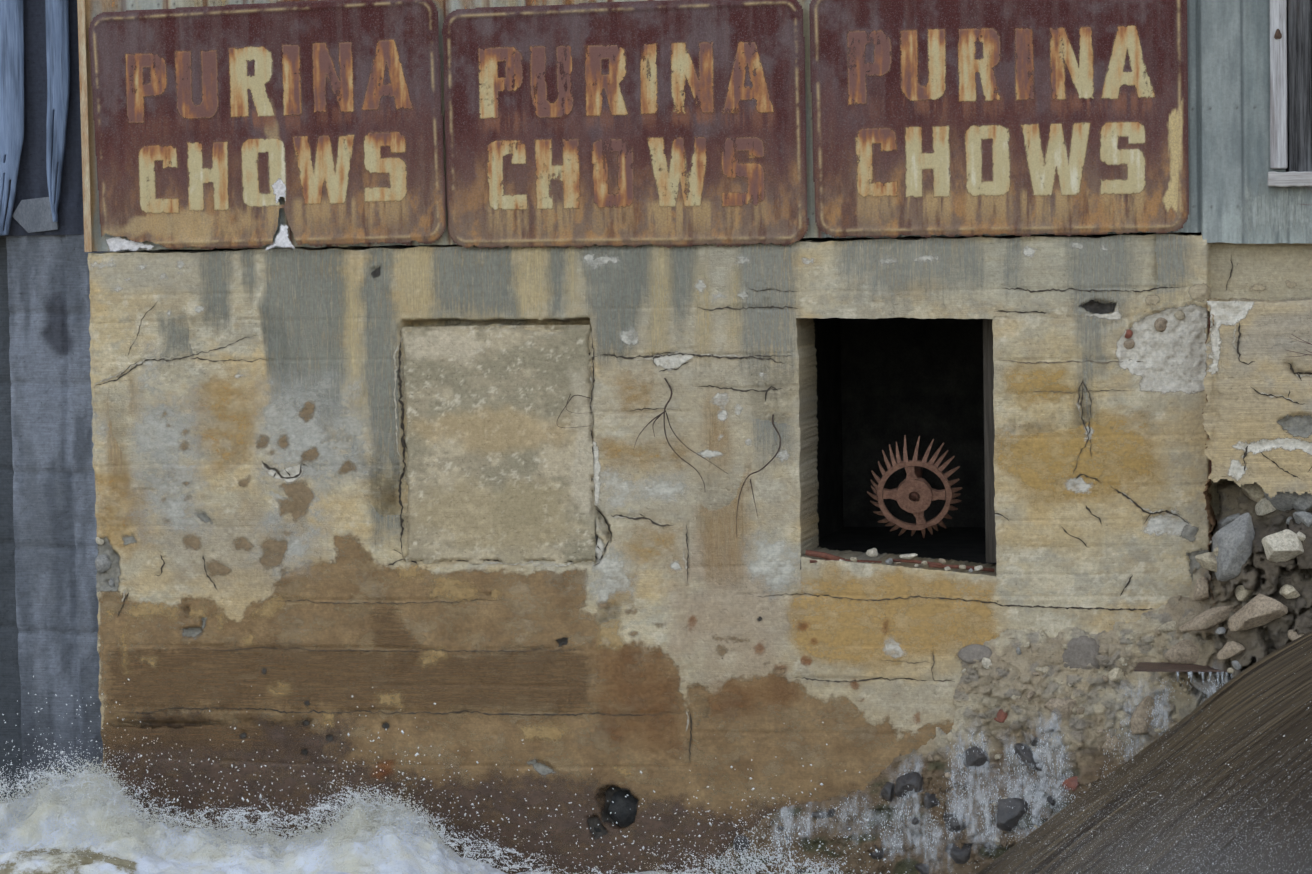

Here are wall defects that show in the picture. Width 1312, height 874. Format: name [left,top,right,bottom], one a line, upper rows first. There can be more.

crack [95,301,270,385]
spalling [1078,284,1266,394]
spalling [262,464,304,482]
spalling [1228,415,1312,481]
leakage [98,243,954,874]